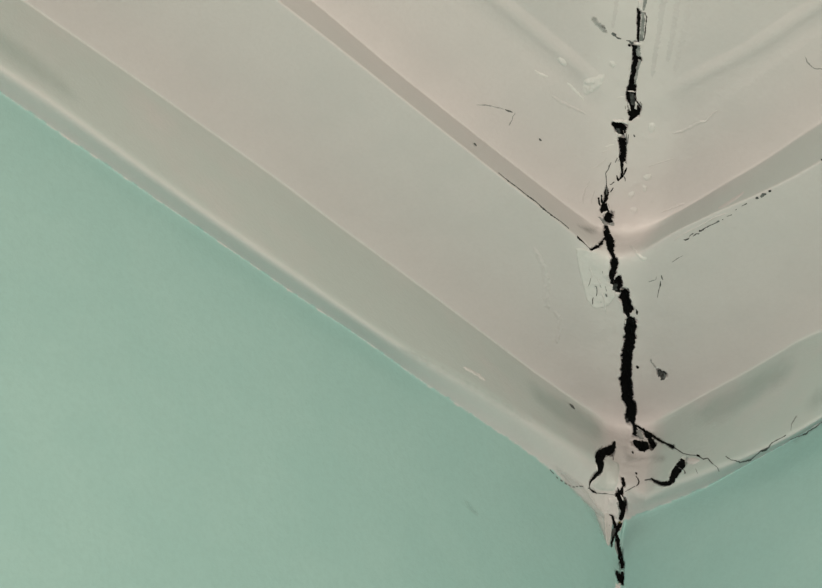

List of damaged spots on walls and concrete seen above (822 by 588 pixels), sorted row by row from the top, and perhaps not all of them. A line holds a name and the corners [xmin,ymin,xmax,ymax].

peeling [576,242,616,312]
crack [499,0,822,588]